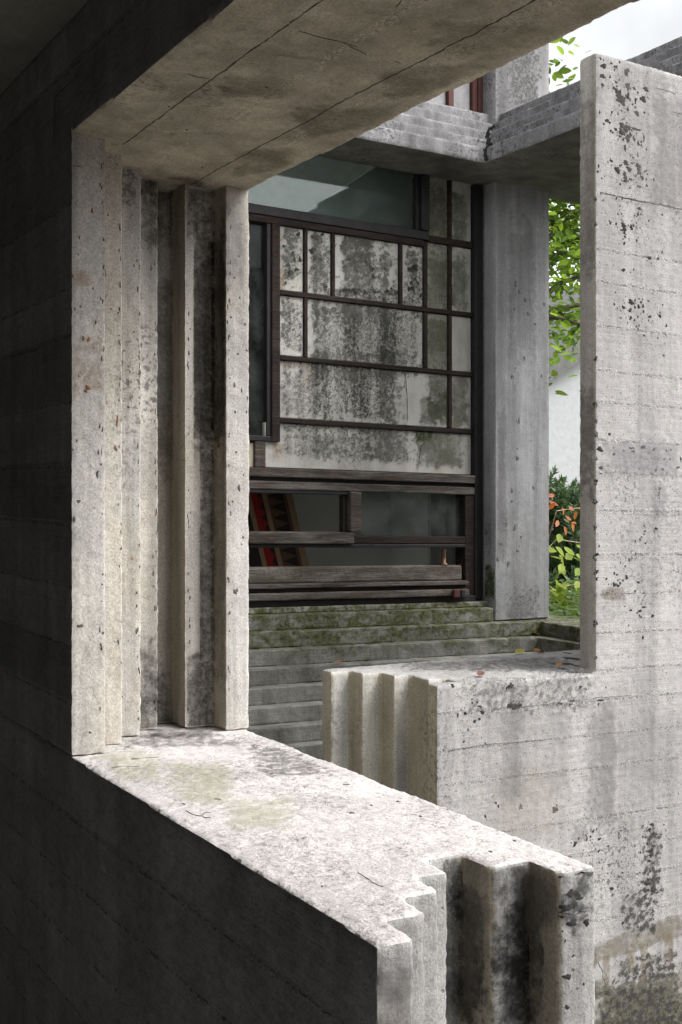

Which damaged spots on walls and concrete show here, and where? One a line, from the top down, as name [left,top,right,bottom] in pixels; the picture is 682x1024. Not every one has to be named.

crack [122,0,367,145]
crack [191,0,536,185]
damp [277,235,429,464]
damp [122,169,331,779]
damp [446,866,594,1023]
damp [562,818,682,1024]